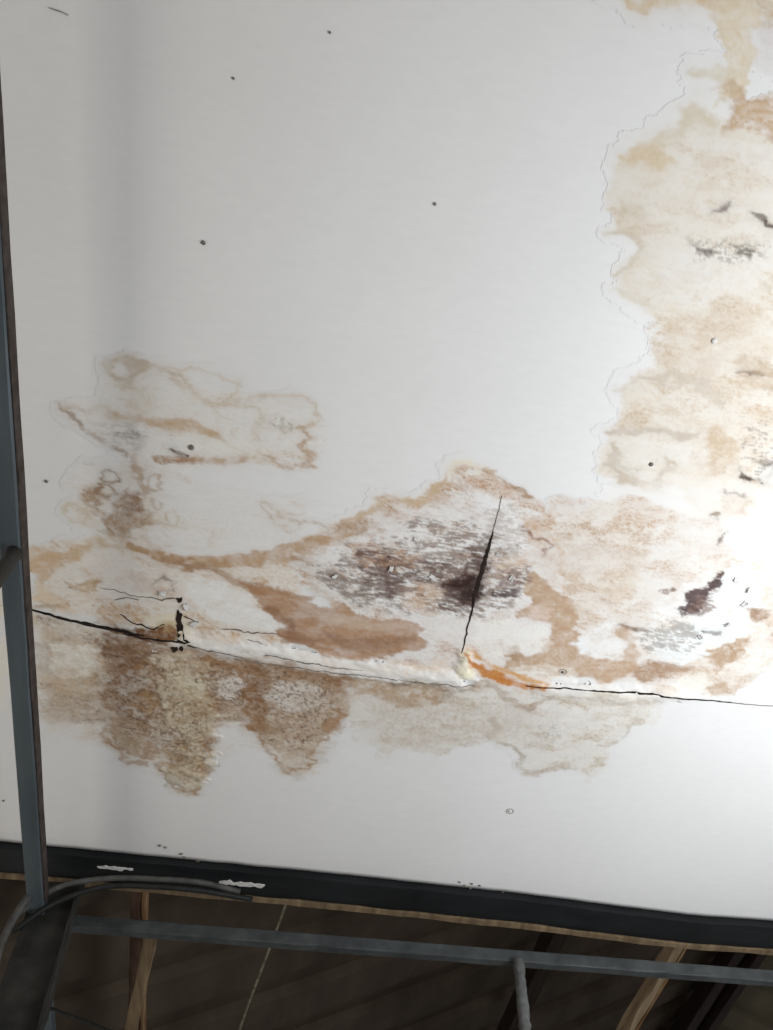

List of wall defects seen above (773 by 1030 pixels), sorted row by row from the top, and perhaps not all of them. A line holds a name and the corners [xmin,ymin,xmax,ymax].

water stain [29,0,773,800]
peeling [152,591,223,792]
crack [32,587,475,687]
crack [461,497,502,653]
corrosion [464,646,550,692]
crack [526,686,772,706]